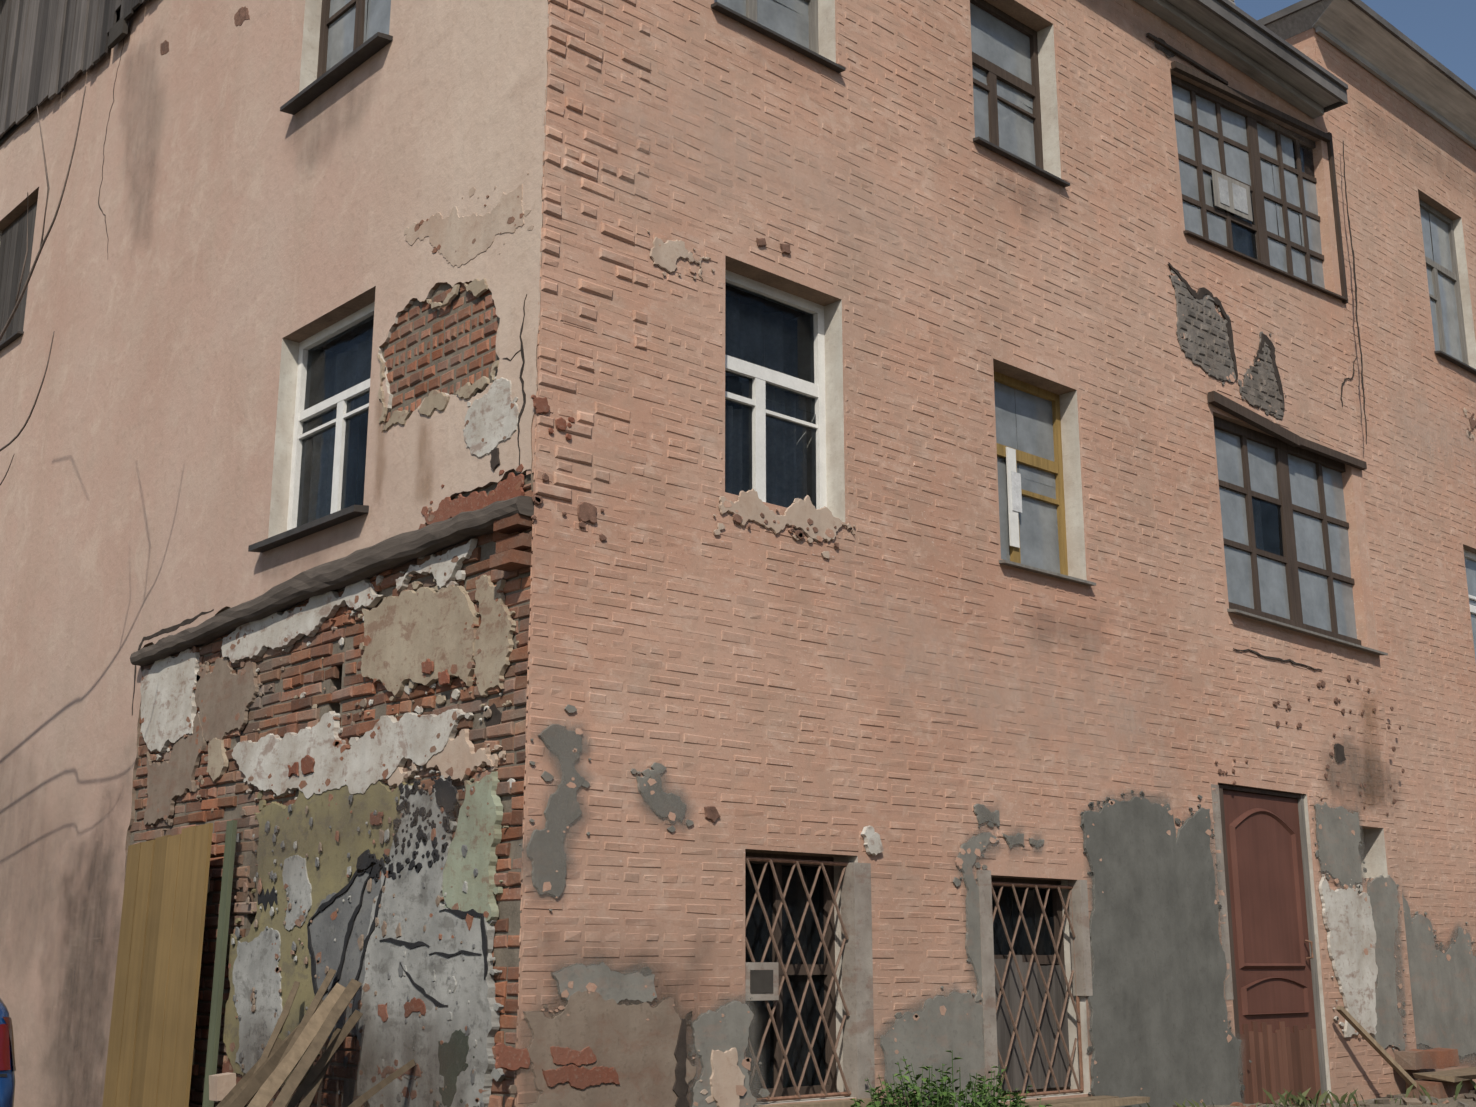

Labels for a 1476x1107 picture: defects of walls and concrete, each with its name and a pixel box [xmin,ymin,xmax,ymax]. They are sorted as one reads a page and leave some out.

peeling [499,196,534,254]
spalling [377,278,506,455]
crack [502,294,527,474]
spalling [510,395,575,440]
spalling [1167,262,1287,420]
peeling [713,498,856,559]
flaking render [130,464,721,1107]
peeling [1080,790,1145,876]
peeling [1161,795,1215,837]
spalling [1308,675,1405,908]